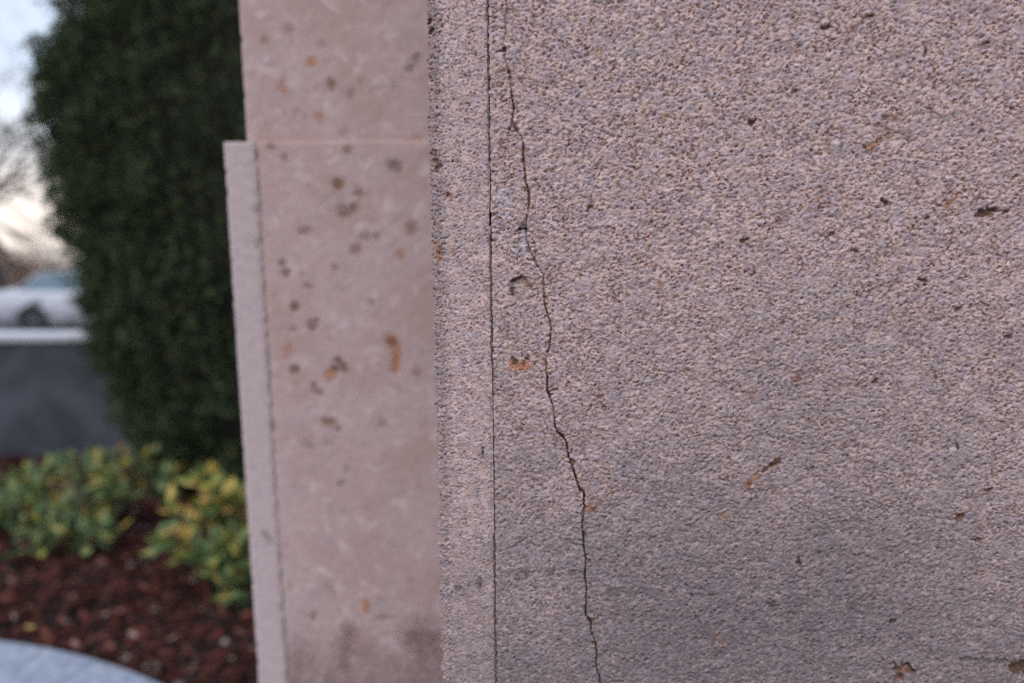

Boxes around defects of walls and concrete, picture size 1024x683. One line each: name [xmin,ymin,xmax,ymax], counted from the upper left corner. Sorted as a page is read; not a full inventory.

crack [496,3,601,683]
rust [509,349,536,371]
rust [746,457,781,486]